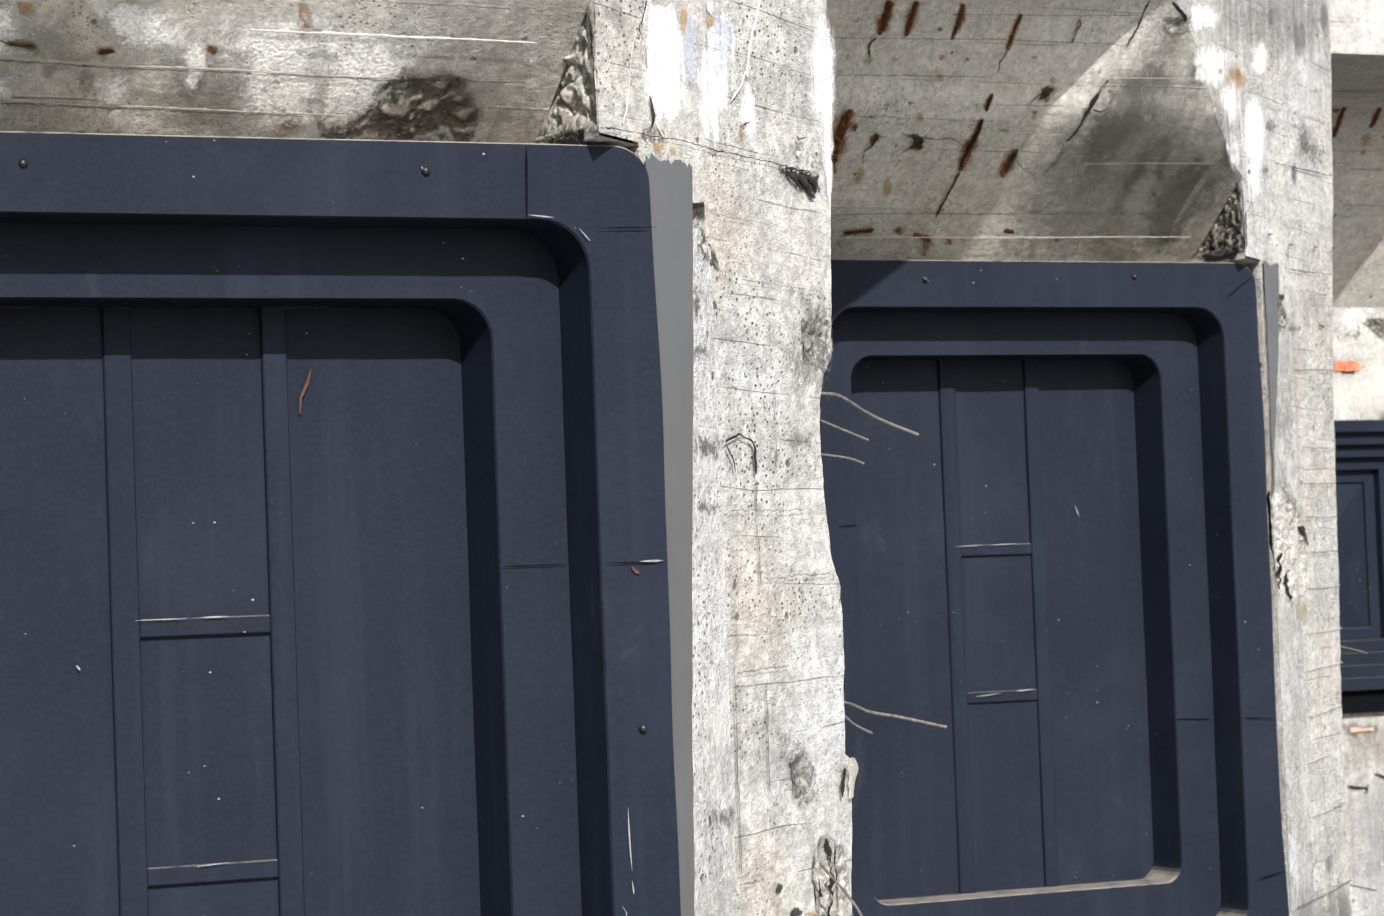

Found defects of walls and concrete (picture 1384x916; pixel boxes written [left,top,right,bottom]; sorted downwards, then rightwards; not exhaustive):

rust [0,40,37,54]
rust [867,1,919,63]
rust [937,4,965,38]
spalling [321,75,480,142]
rust [831,109,857,173]
rust [1332,107,1346,137]
rust [1000,148,1030,177]
spalling [1193,182,1244,262]
spalling [1277,294,1299,332]
spalling [1319,317,1384,341]
flaking render [1333,360,1362,375]
spalling [790,835,850,916]